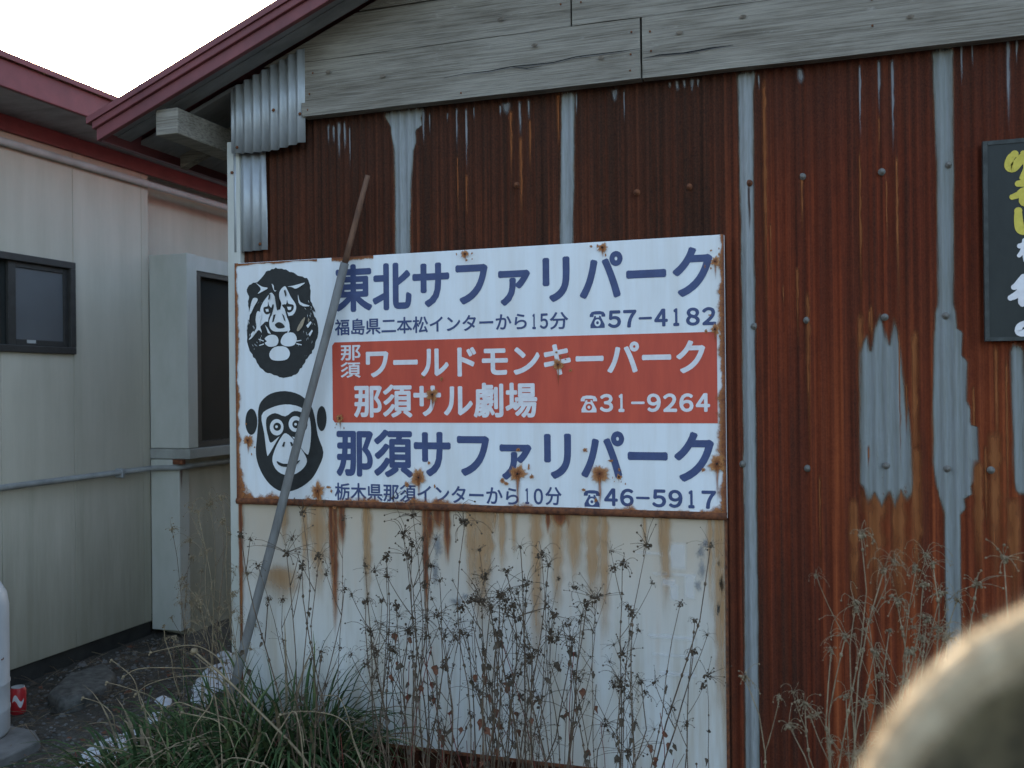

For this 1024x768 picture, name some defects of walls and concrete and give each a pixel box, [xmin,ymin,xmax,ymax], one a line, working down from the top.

corrosion [510,111,531,205]
corrosion [762,83,772,265]
corrosion [886,158,899,270]
corrosion [304,481,379,616]
corrosion [393,461,470,605]
corrosion [500,464,534,507]
corrosion [582,460,626,509]
corrosion [659,518,670,583]
corrosion [679,234,727,513]
peeling [859,315,913,506]
corrosion [849,332,923,608]
corrosion [973,434,1022,591]